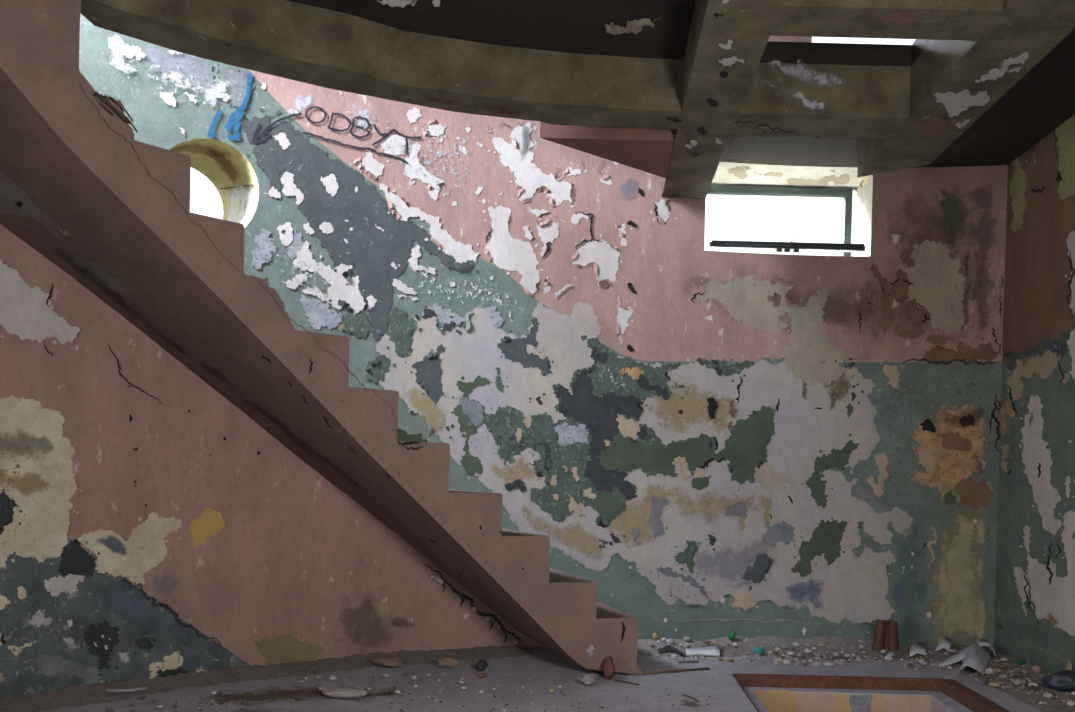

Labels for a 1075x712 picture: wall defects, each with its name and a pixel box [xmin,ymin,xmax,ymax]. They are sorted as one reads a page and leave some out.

peeling [264,161,305,205]
peeling [320,174,339,206]
leakage [911,190,967,252]
peeling [0,260,83,350]
peeling [251,220,377,330]
leakage [773,284,809,314]
leakage [822,282,928,326]
peeling [349,107,939,646]
spalling [899,231,1075,637]
peeling [0,395,229,597]
leakage [929,505,987,644]
crack [1024,542,1061,636]